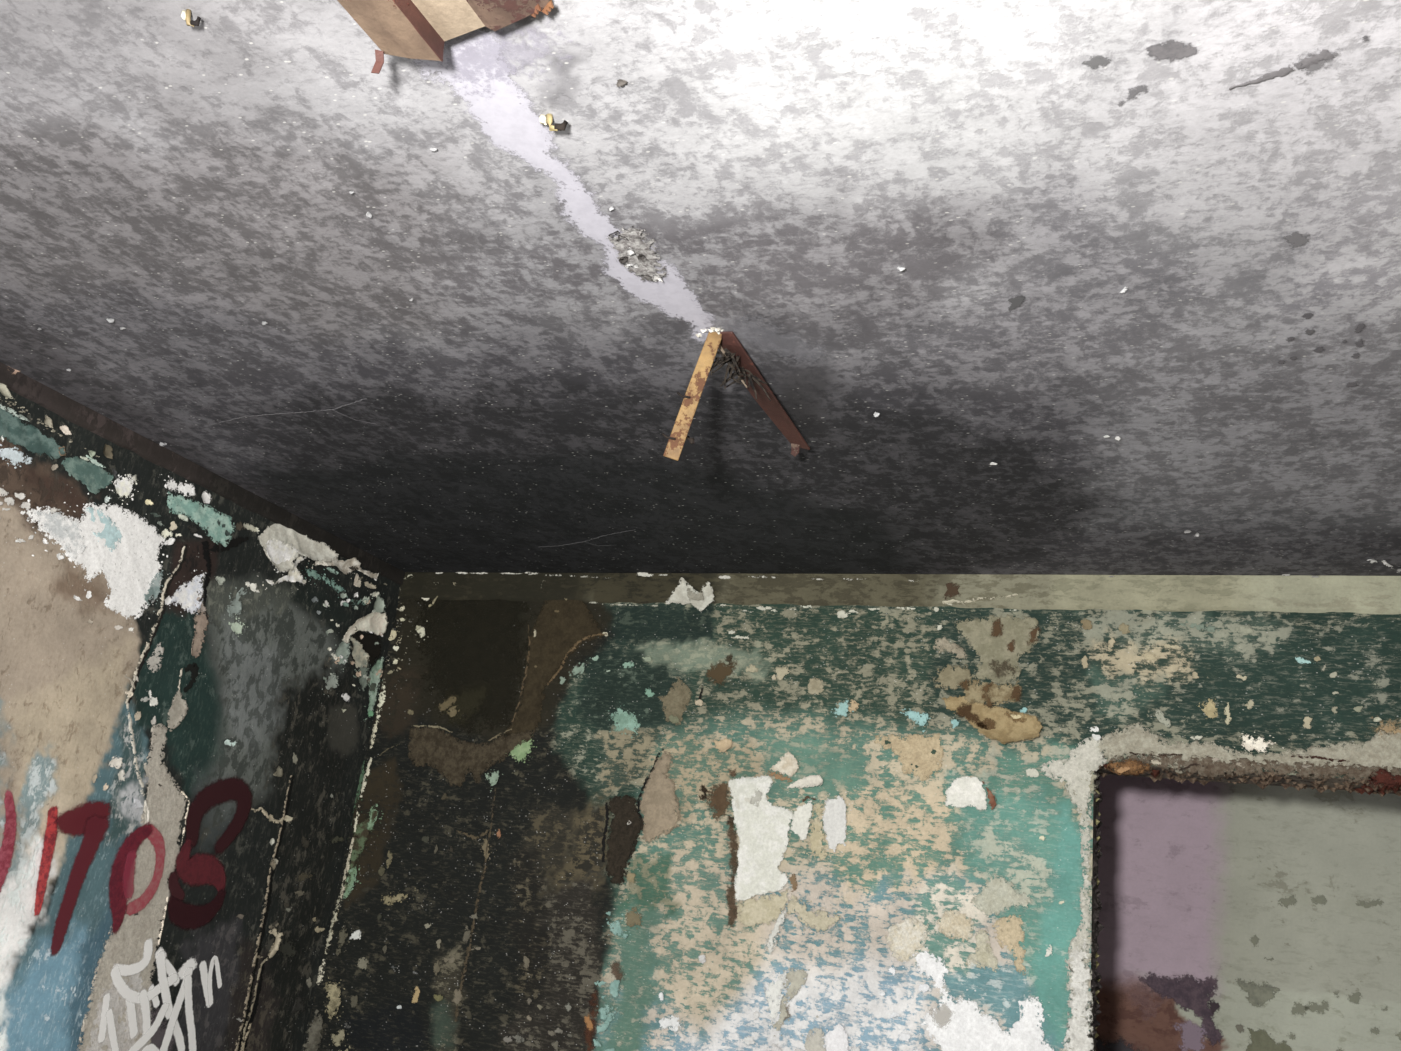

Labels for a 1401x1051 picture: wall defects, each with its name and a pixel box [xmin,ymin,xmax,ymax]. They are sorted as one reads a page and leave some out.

spalling [607,226,669,283]
peeling [837,608,880,618]
flaking render [933,603,967,660]
flaking render [0,368,732,1051]
leakage [436,687,486,724]
peeling [745,661,824,695]
peeling [831,699,859,719]
spalling [874,620,1401,1051]
peeling [726,751,860,1051]